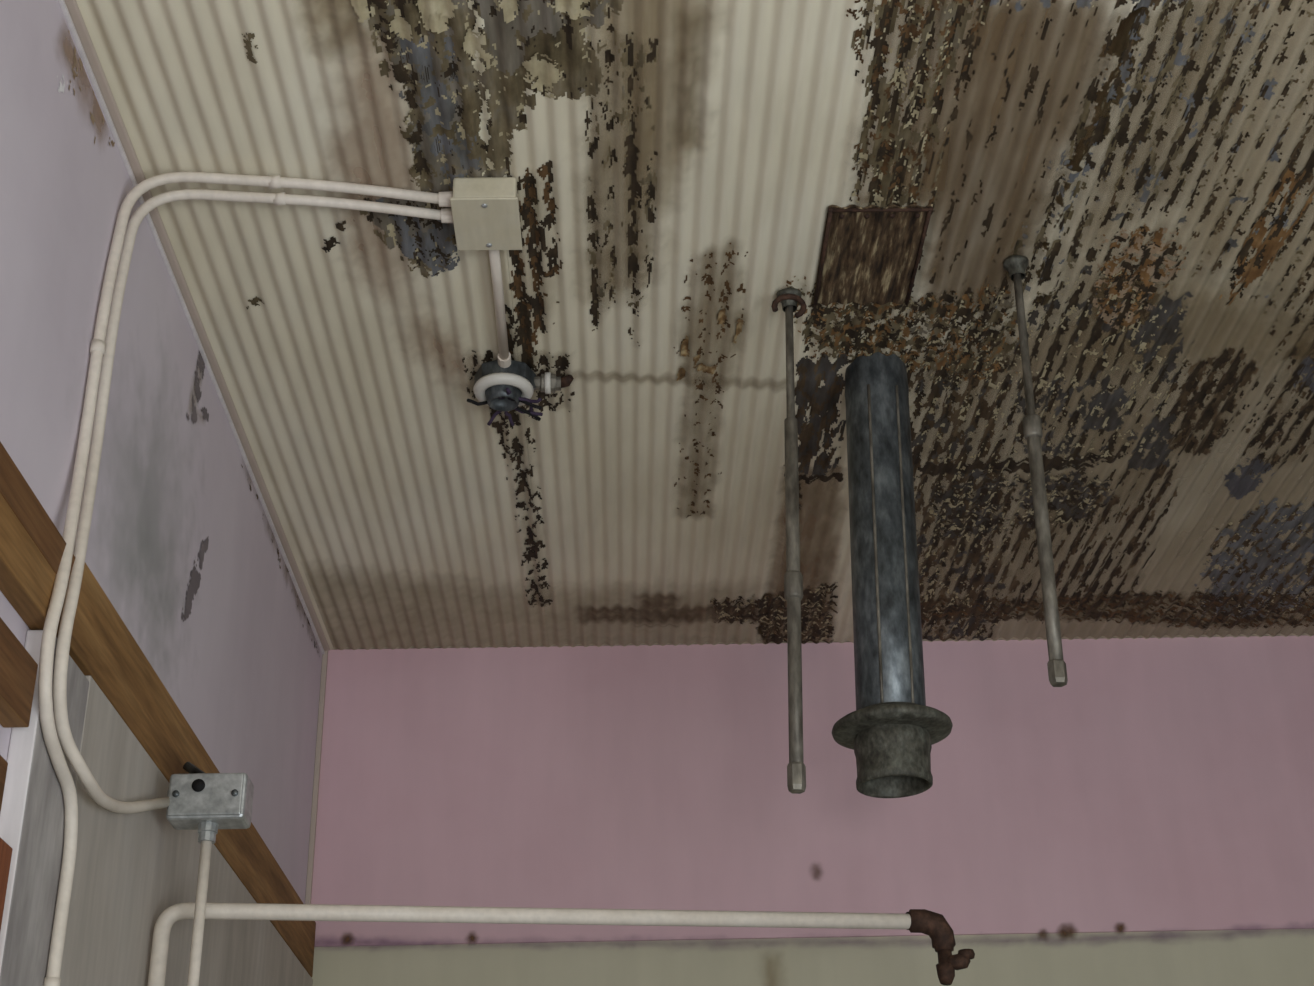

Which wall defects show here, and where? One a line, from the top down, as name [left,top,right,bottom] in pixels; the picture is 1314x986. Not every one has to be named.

peeling [242,33,258,64]
corrosion [846,0,991,215]
peeling [321,0,658,607]
corrosion [674,243,748,518]
peeling [784,351,848,476]
corrosion [786,276,1020,385]
peeling [906,0,1314,642]
corrosion [1093,223,1186,330]
corrosion [1219,160,1314,305]
peeling [710,582,838,644]
corrosion [920,590,1314,629]